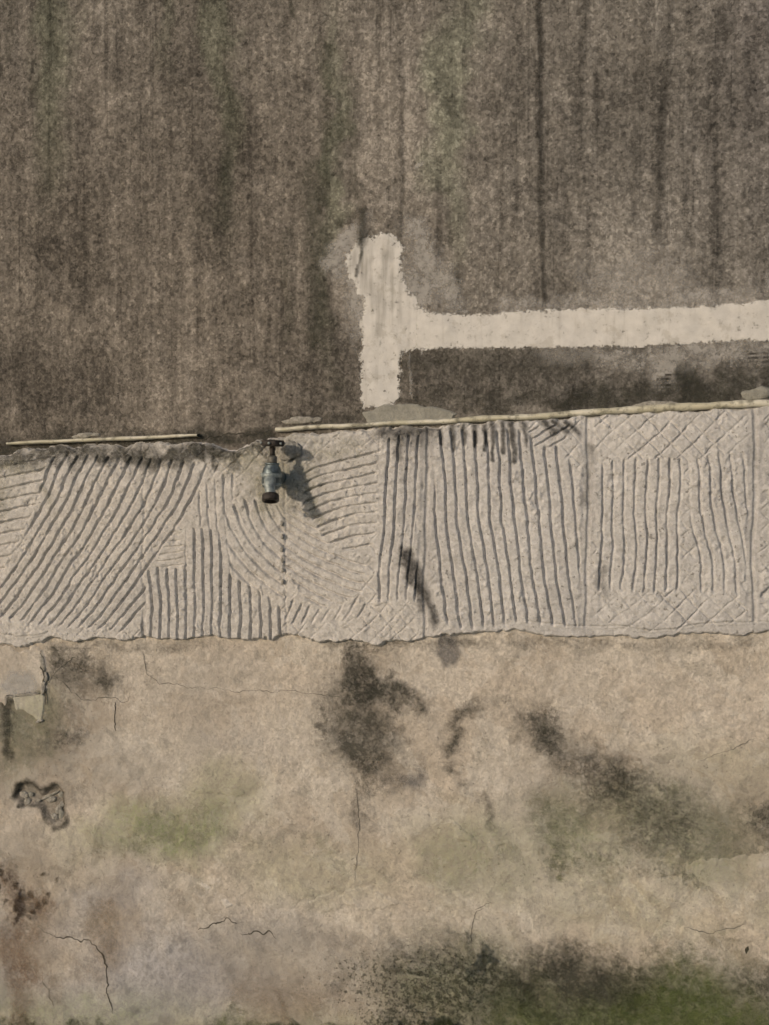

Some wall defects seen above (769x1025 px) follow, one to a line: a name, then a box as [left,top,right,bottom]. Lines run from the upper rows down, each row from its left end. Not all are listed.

water stain [355,209,366,276]
water stain [440,396,527,463]
water stain [542,367,769,434]
water stain [401,551,437,623]
peeling [0,644,48,723]
crack [143,654,342,698]
water stain [329,658,424,774]
spalling [12,780,68,829]
crack [36,926,112,1007]
crack [198,918,275,938]
water stain [511,947,624,1002]
crack [686,924,749,954]